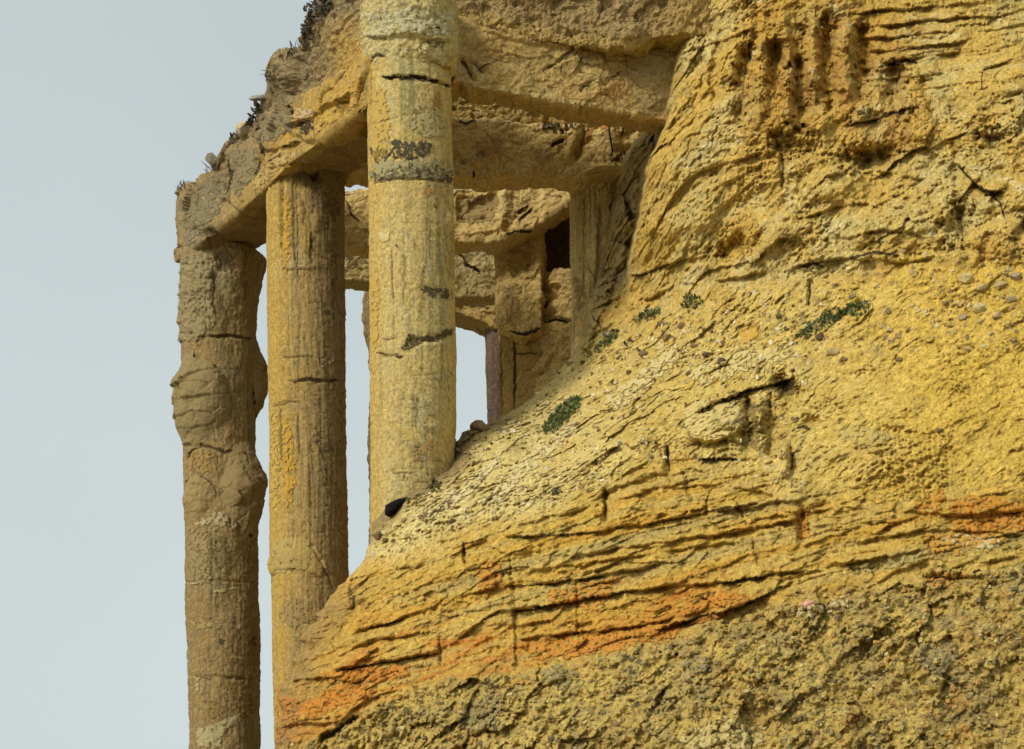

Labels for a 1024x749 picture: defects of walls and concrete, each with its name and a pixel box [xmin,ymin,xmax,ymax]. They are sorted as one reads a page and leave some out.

crack [371,27,490,88]
spalling [370,139,515,229]
crack [210,260,252,340]